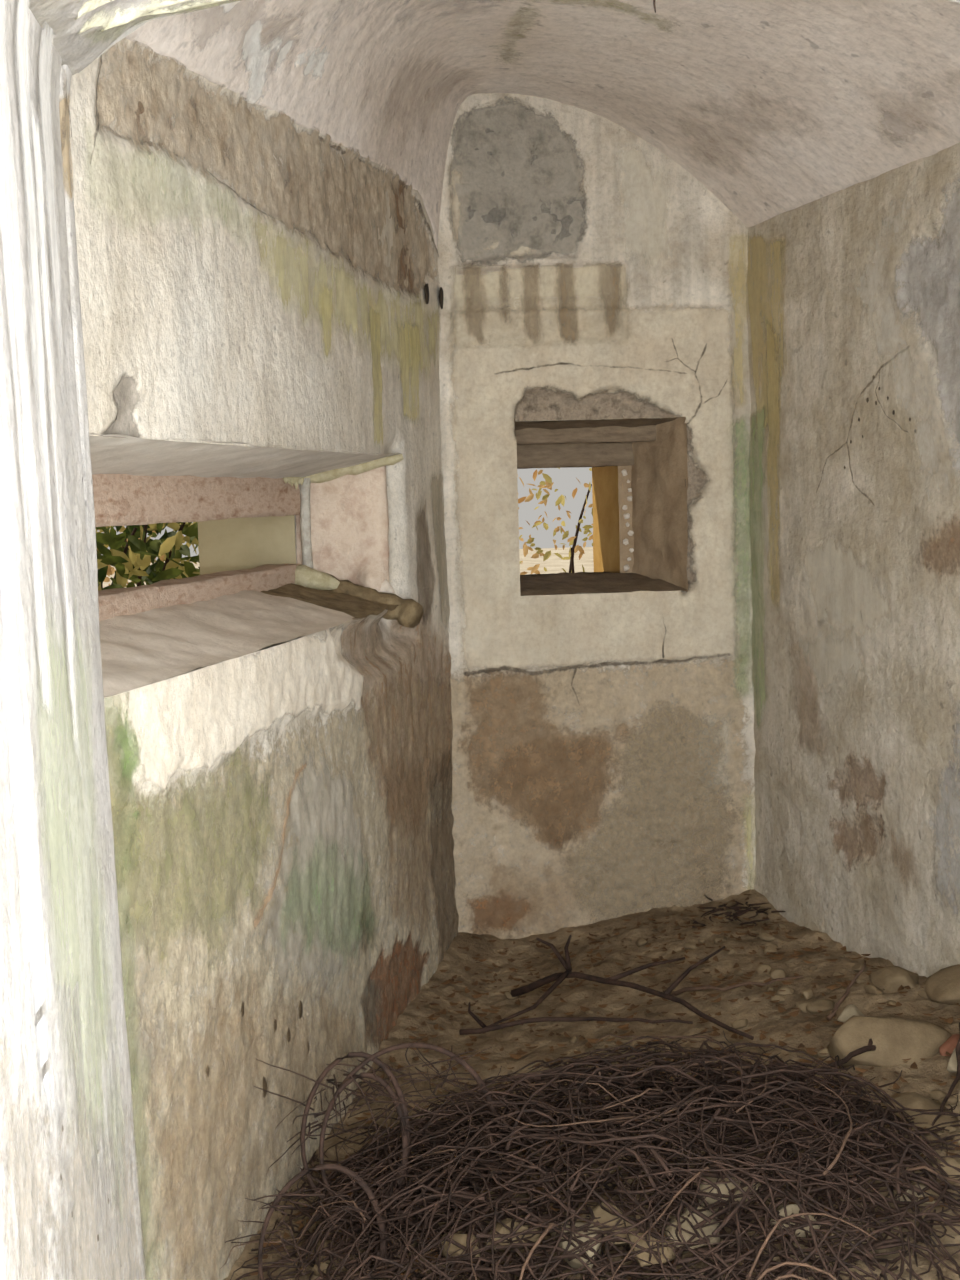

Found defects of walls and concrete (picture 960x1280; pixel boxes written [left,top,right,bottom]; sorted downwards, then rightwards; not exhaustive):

water stain [256,214,437,442]
spalling [449,96,587,266]
peeling [449,308,736,671]
water stain [341,475,629,963]